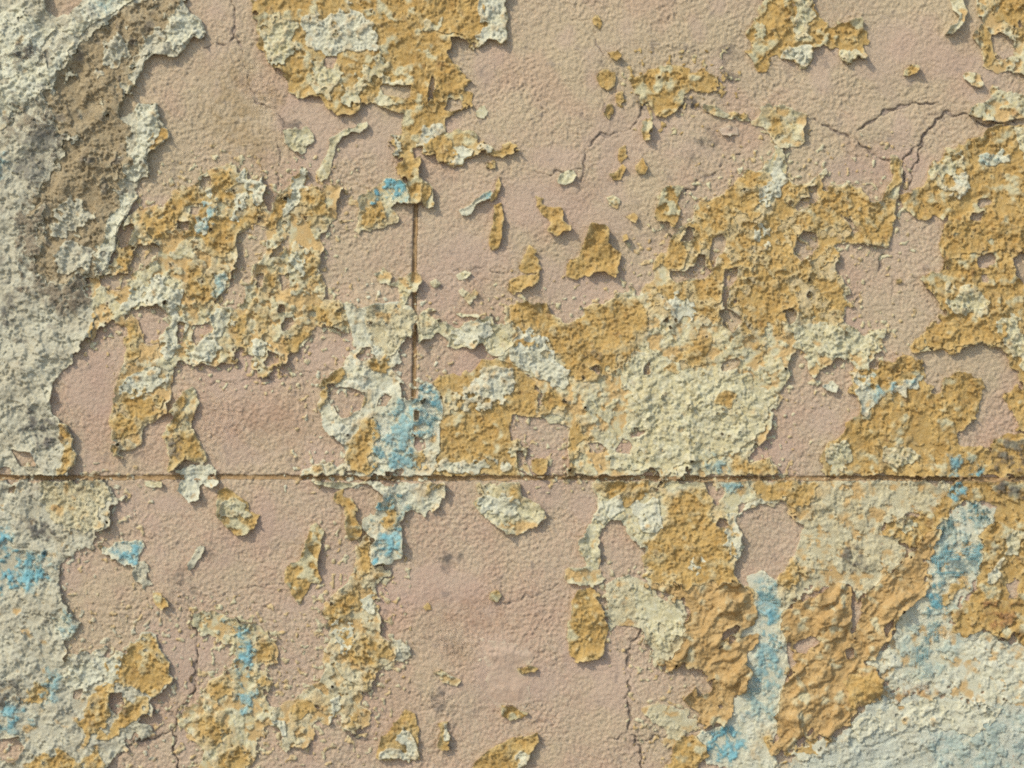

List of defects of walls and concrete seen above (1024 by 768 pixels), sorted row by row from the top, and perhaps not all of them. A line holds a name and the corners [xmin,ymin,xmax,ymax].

peeling [744,0,870,72]
peeling [282,126,314,162]
crack [814,102,1015,185]
peeling [557,170,577,185]
peeling [459,178,504,257]
peeling [535,196,572,236]
peeling [216,487,260,536]
peeling [101,540,153,589]
peeling [52,611,79,640]
peeling [24,633,175,768]
crack [618,629,660,768]
peeling [365,709,420,763]